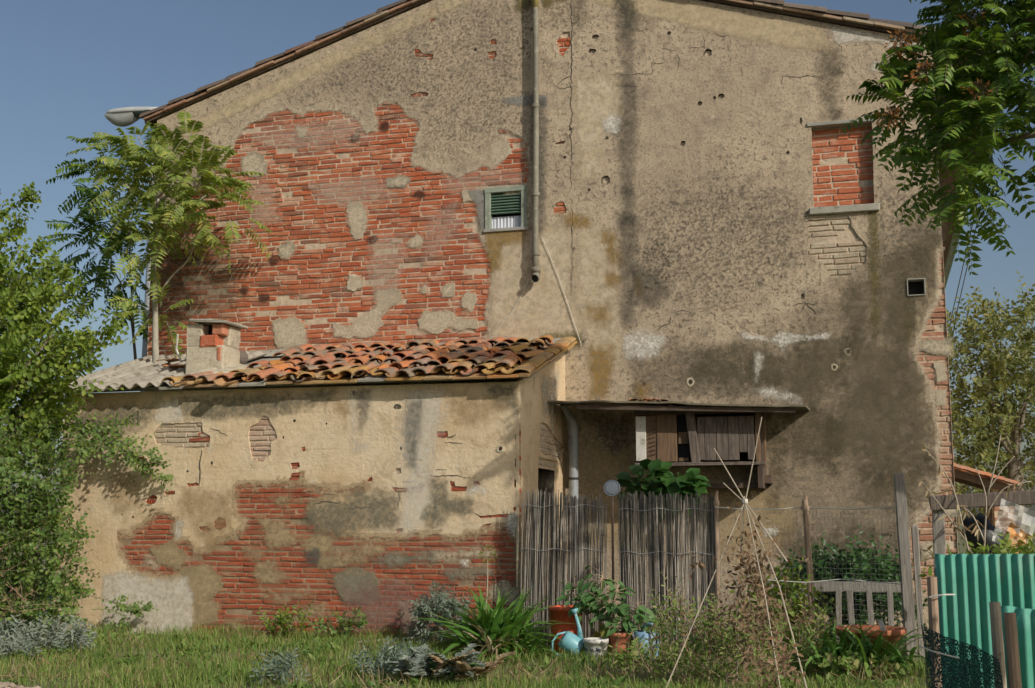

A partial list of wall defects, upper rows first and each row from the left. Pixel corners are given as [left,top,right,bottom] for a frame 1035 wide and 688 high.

spalling [557,32,571,56]
crack [556,0,578,296]
peeling [148,92,532,368]
spalling [154,422,210,448]
spalling [249,416,277,462]
damp [403,389,442,529]
spalling [538,423,562,470]
efflorescence [623,332,665,358]
damp [691,196,939,575]
peeling [909,241,958,597]
peeling [116,447,521,642]